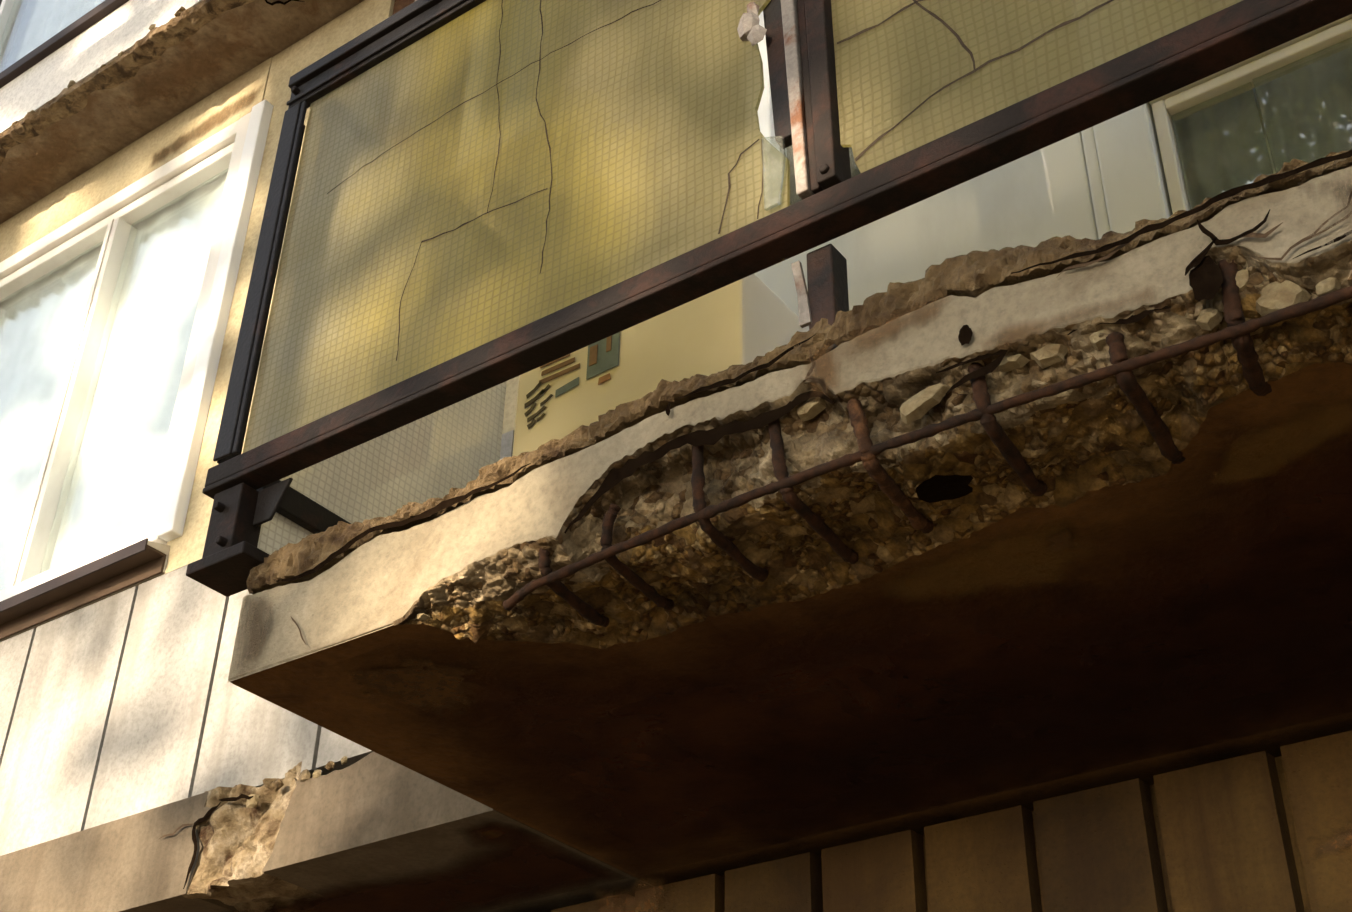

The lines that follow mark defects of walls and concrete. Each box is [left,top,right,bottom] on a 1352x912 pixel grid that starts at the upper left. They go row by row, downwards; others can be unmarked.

crack [265,0,305,8]
spalling [0,0,255,166]
crack [1011,149,1352,278]
crack [1067,306,1171,335]
spalling [393,240,1352,649]
leakage [239,598,271,662]
leakage [353,446,1352,851]
crack [159,794,253,889]
spalling [182,756,348,912]
leakage [278,823,665,912]